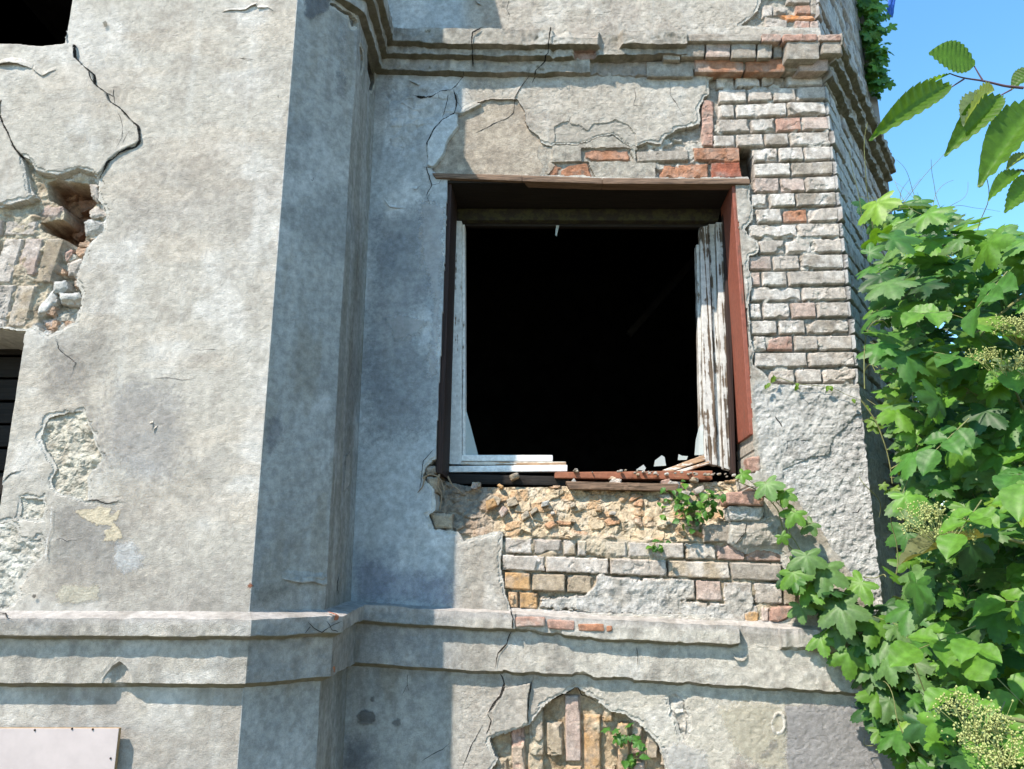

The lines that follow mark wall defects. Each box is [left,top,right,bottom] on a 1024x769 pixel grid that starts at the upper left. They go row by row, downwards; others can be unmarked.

crack [0,108,30,160]
crack [66,34,141,177]
crack [414,27,482,205]
crack [479,27,551,132]
flaking render [0,163,106,336]
flaking render [426,76,856,385]
flaking render [0,497,46,608]
flaking render [42,411,122,542]
flaking render [425,456,800,632]
crack [425,612,596,769]
flaking render [490,683,665,769]